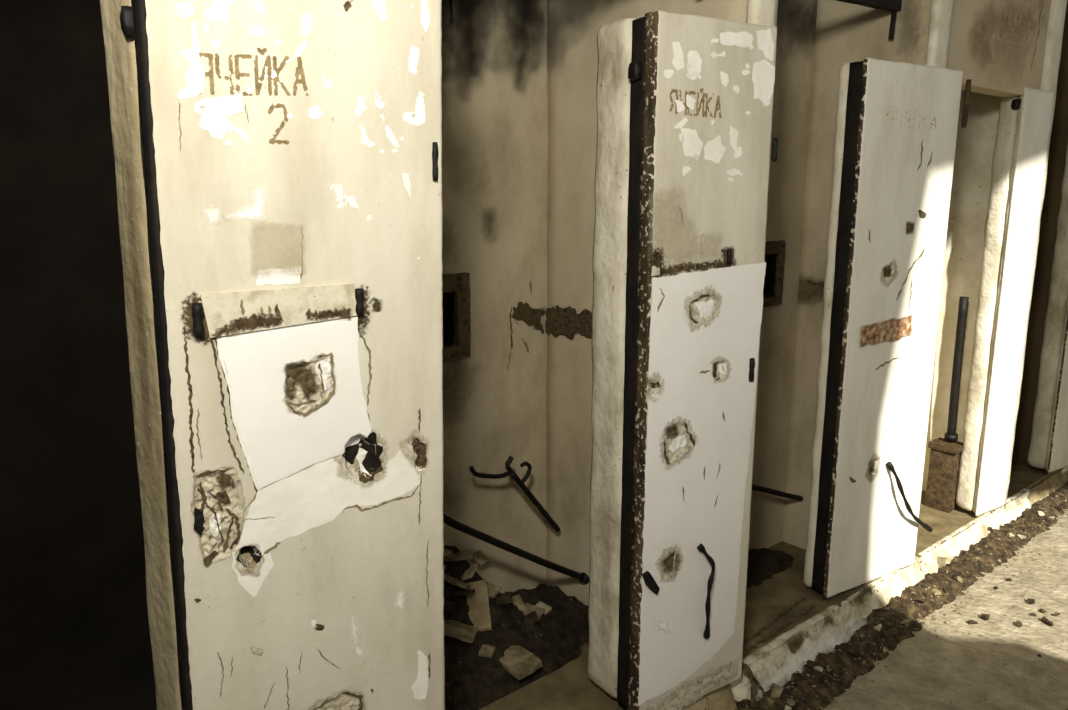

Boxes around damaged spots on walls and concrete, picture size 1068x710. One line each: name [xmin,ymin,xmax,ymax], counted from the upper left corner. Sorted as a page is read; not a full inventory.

peeling [176,0,254,146]
damp [441,0,542,80]
peeling [664,28,775,107]
peeling [403,91,425,126]
peeling [674,94,743,182]
spalling [511,302,592,340]
spalling [685,288,721,331]
spalling [284,353,336,416]
spalling [699,357,730,382]
spalling [660,419,696,469]
peeling [191,409,428,597]
spalling [658,547,683,582]